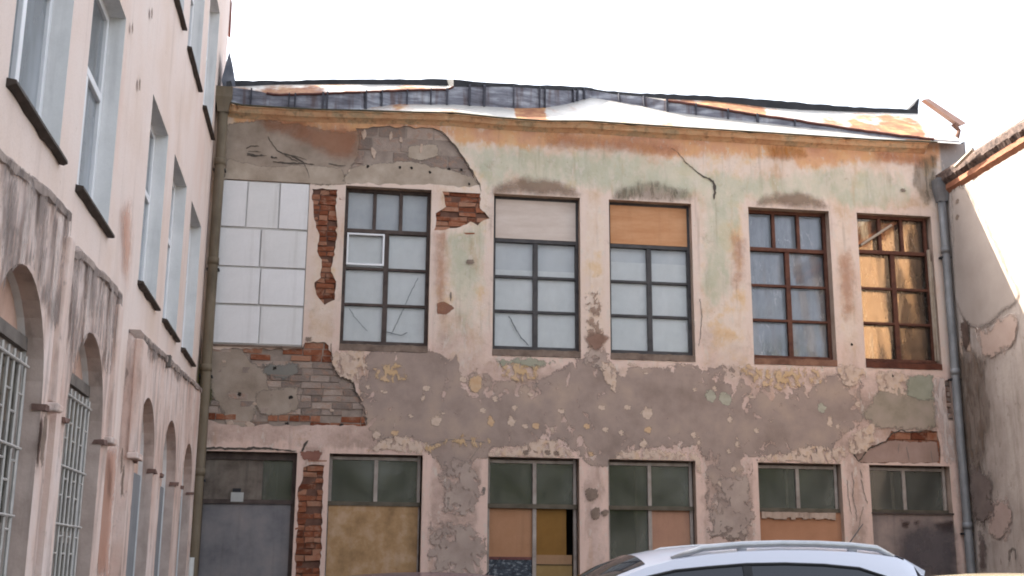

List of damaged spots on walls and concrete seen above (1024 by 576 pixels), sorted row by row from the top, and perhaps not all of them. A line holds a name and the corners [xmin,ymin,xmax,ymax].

rust [668,100,934,141]
crack [246,137,346,175]
peeling [224,120,489,305]
leakage [494,179,574,195]
leakage [616,183,685,201]
crack [671,148,716,199]
leakage [760,193,825,207]
leakage [2,159,123,374]
peeling [208,291,953,574]